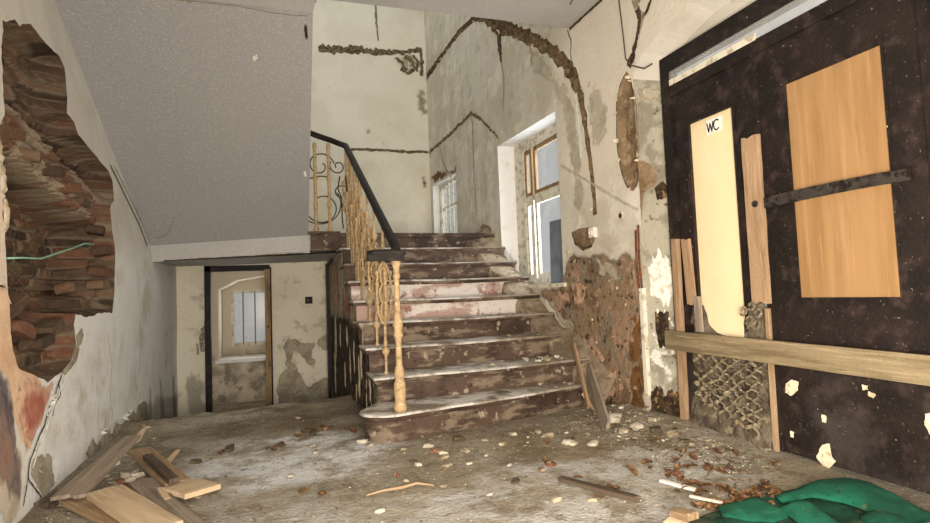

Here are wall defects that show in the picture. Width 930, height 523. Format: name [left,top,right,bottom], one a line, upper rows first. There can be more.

crack [178,0,602,216]
peeling [524,44,583,209]
spalling [587,0,667,220]
spalling [0,19,115,496]
peeling [548,271,589,331]
peeling [564,227,626,306]
peeling [0,475,19,523]
water stain [0,373,53,497]
crack [23,373,67,506]